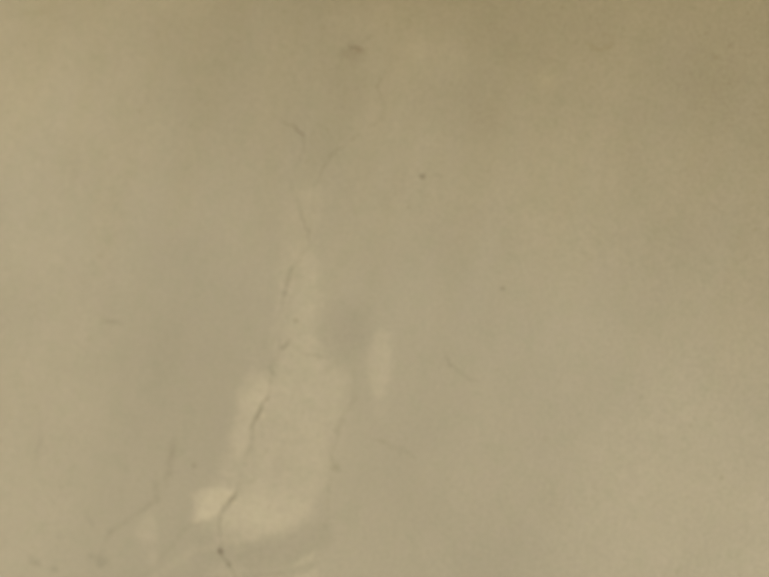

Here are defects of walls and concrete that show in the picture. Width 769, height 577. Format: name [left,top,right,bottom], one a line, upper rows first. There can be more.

peeling [187,485,235,523]